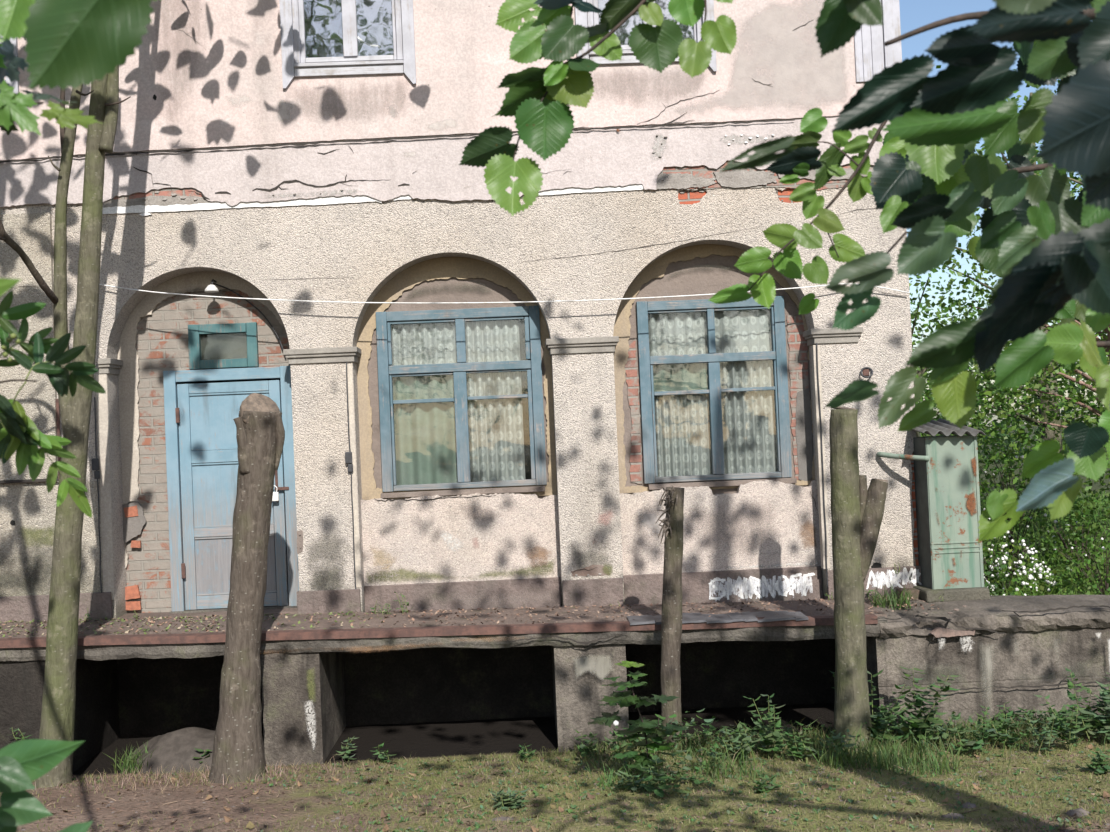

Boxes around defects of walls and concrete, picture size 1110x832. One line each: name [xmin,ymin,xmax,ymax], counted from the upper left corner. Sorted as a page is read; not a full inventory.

crack [572,90,795,131]
crack [0,133,480,199]
spalling [538,134,874,205]
flaking render [102,188,412,216]
flaking render [625,338,643,484]
spalling [122,501,146,548]
rust [966,493,977,515]
spalling [125,585,141,610]